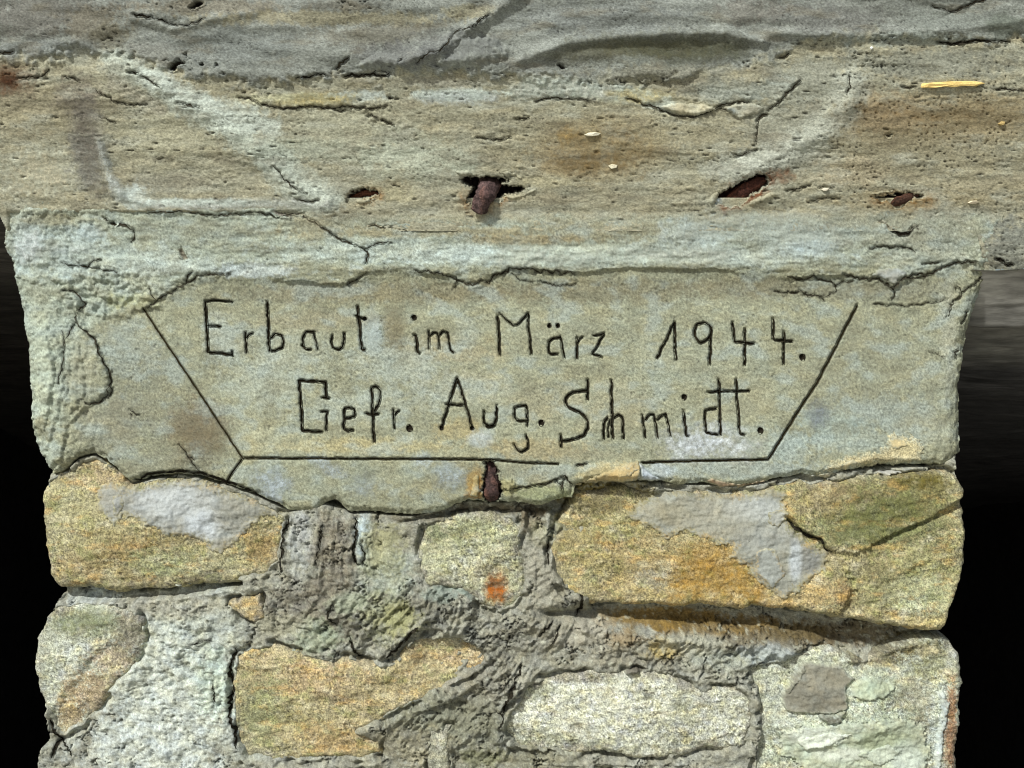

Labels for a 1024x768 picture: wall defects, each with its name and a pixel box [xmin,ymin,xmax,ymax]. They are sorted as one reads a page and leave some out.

crack [627,80,801,156]
crack [102,166,405,285]
crack [787,520,832,552]